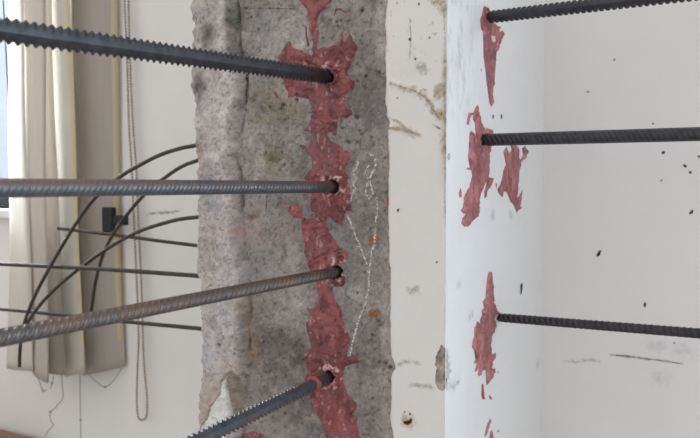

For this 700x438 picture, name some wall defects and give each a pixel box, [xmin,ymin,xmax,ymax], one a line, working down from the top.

spalling [226,371,245,416]